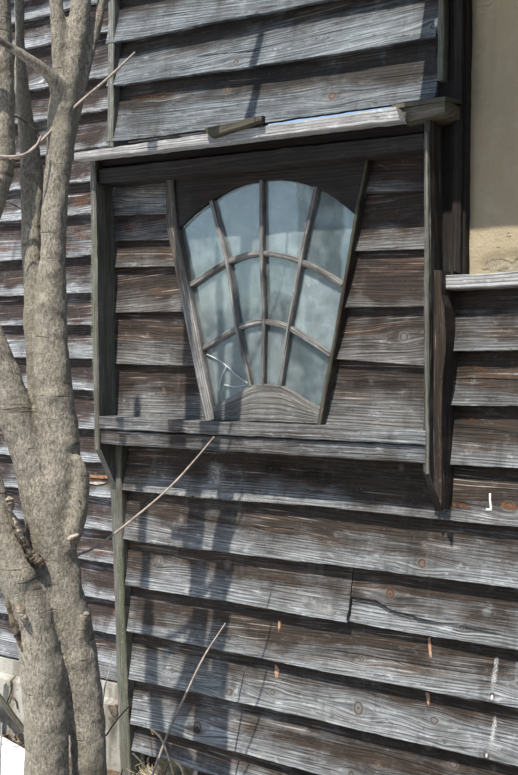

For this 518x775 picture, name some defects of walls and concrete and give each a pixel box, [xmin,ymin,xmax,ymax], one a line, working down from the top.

crack [346,597,437,622]